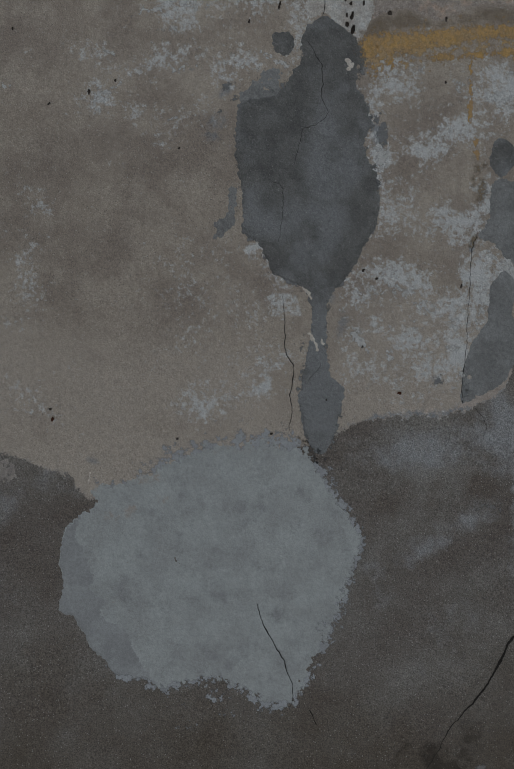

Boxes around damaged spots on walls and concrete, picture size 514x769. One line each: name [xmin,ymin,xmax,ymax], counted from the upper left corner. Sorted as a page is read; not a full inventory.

corrosion [353,15,514,124]
crack [282,297,321,425]
flaking render [452,368,513,409]
crack [257,604,317,725]
crack [427,636,514,768]